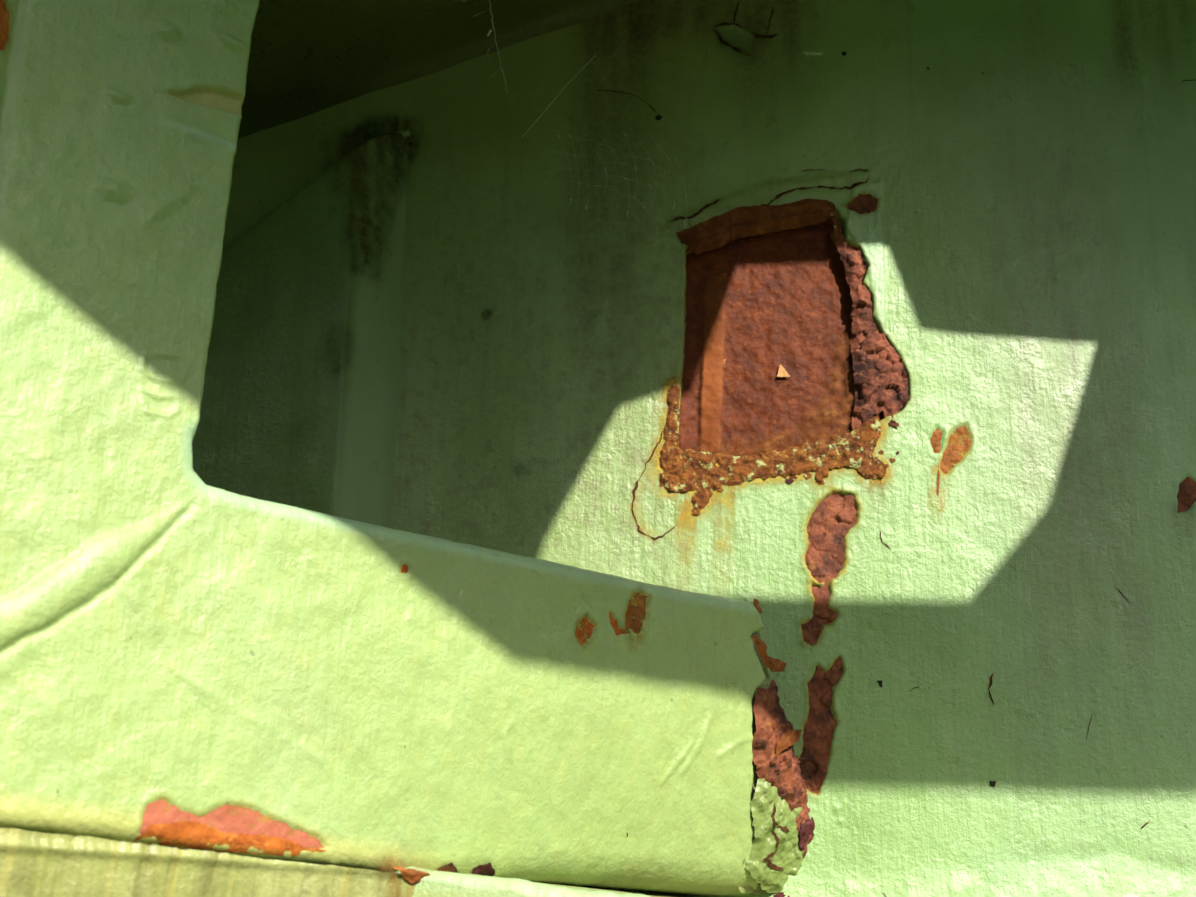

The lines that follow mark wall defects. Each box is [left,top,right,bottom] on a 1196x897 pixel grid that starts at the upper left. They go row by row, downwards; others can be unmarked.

crack [713,2,778,56]
crack [670,199,722,228]
crack [753,169,869,240]
corrosion [653,193,910,541]
crack [631,428,677,540]
peeling [930,425,971,496]
peeling [1177,476,1196,513]
peeling [801,490,861,645]
peeling [575,614,595,645]
peeling [609,591,647,636]
peeling [799,656,843,794]
peeling [134,799,327,857]